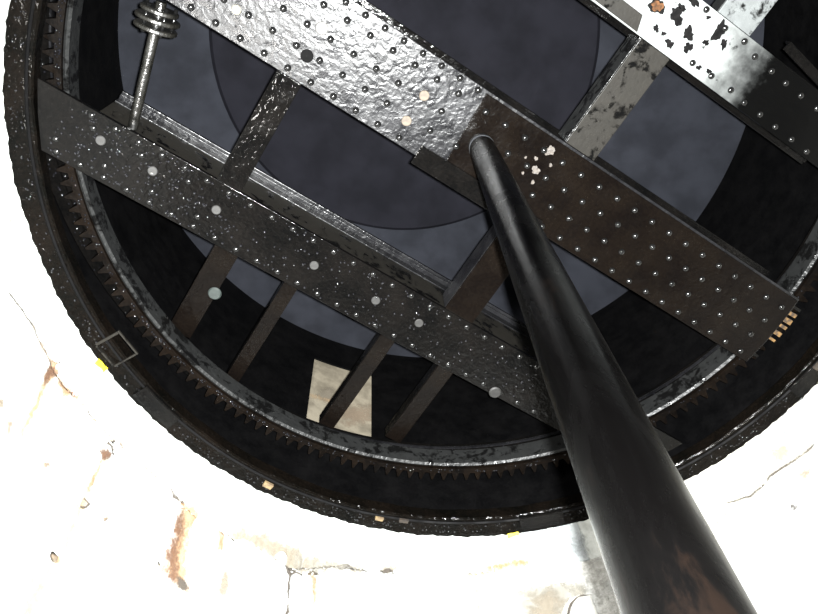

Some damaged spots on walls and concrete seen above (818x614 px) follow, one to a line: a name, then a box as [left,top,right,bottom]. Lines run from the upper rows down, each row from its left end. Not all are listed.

corrosion [651,0,664,12]
corrosion [10,363,83,451]
crack [9,293,190,505]
corrosion [87,442,114,491]
crack [720,444,814,505]
corrosion [164,503,198,590]
crack [285,564,393,614]